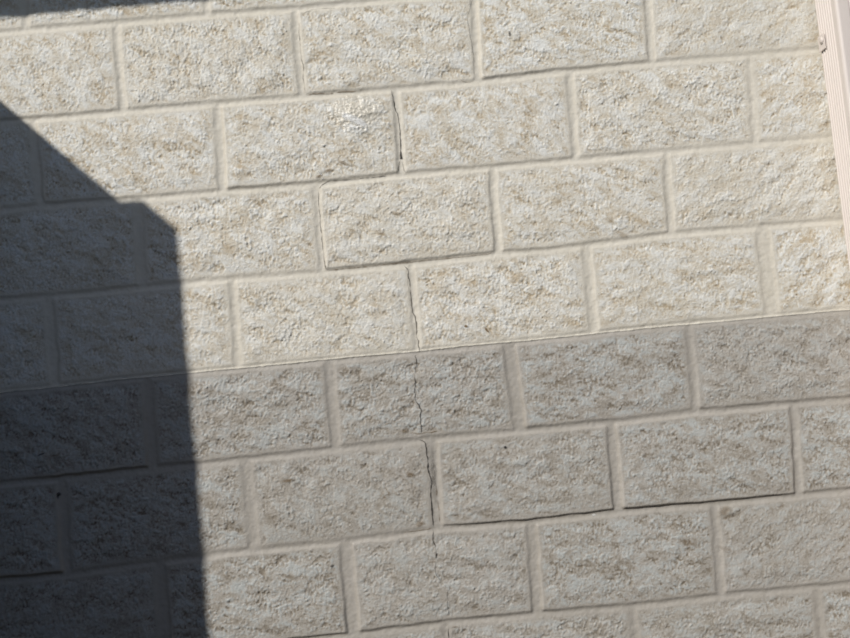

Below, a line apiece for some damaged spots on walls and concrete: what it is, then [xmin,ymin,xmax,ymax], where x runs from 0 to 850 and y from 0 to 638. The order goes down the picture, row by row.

crack [318,91,490,638]